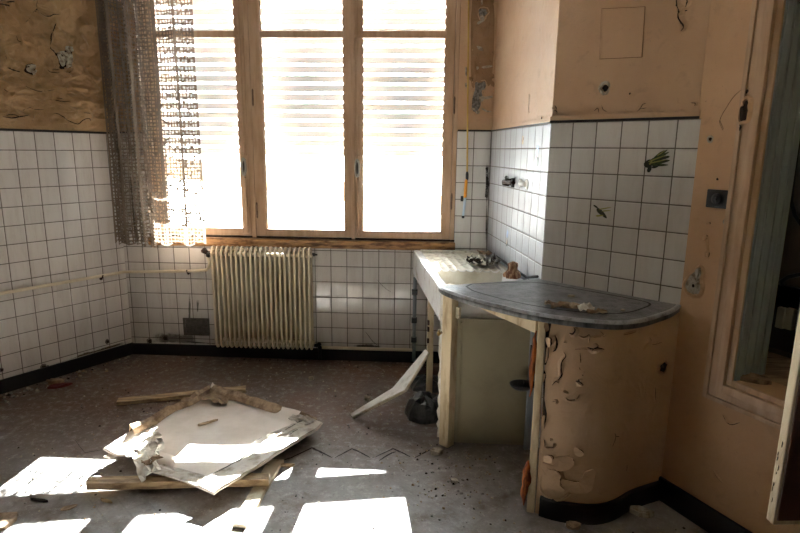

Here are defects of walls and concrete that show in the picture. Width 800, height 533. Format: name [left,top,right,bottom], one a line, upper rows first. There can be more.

crack [0,0,91,126]
peeling [465,0,495,115]
spalling [682,264,705,299]
peeling [539,323,595,502]